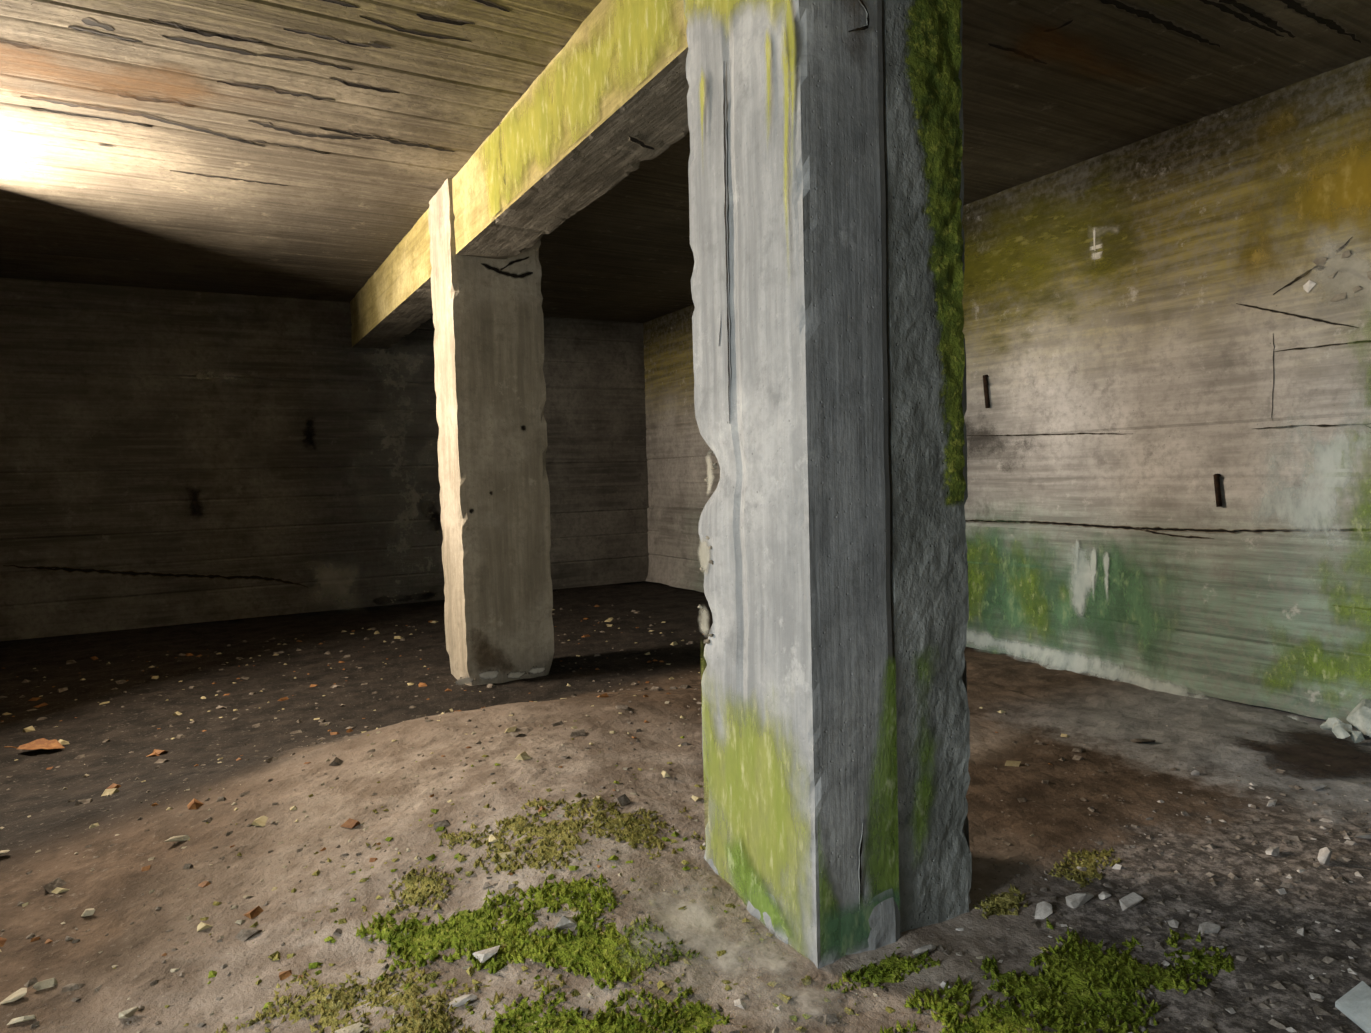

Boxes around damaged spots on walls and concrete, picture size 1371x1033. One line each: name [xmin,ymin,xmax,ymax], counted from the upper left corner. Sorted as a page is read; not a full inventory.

spalling [704,450,717,491]
leakage [1260,433,1371,532]
spalling [699,536,713,572]
leakage [1071,542,1109,614]
spalling [698,605,713,644]